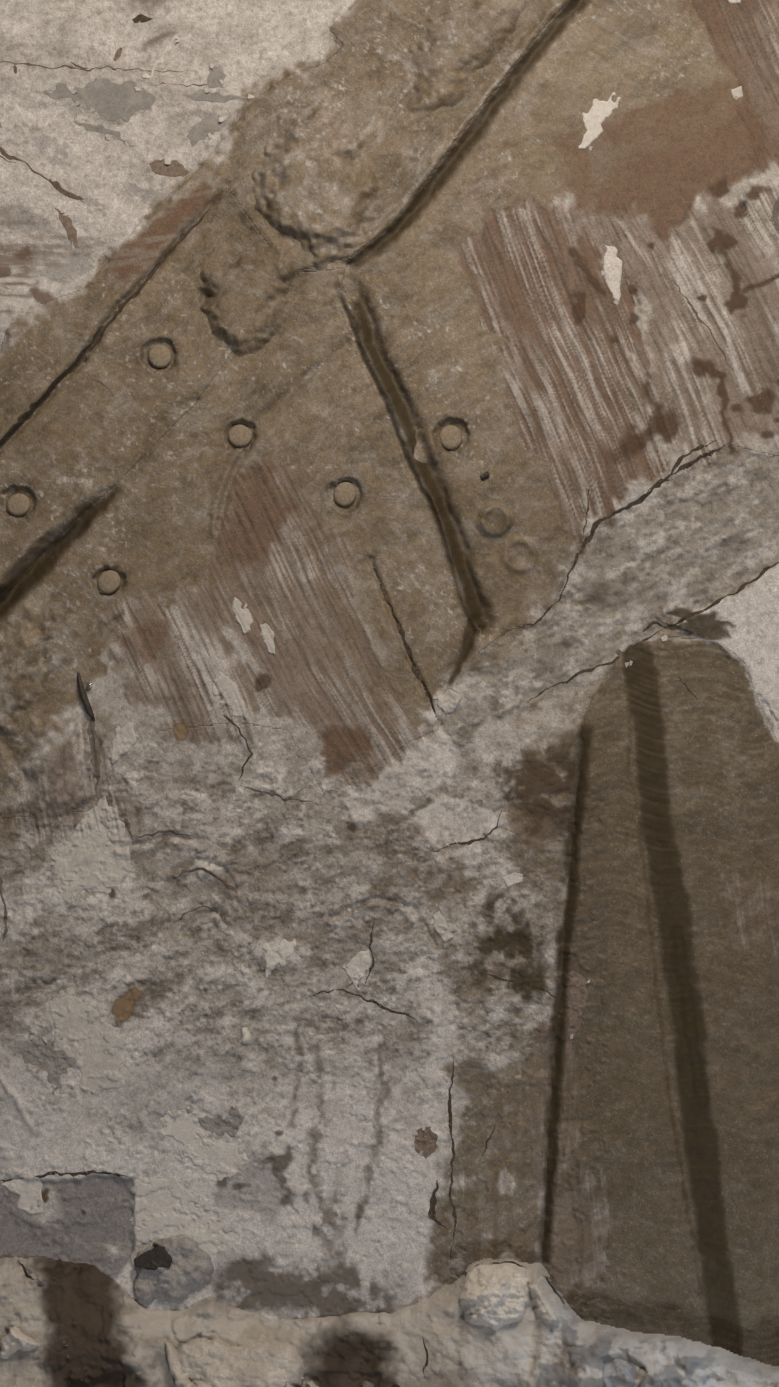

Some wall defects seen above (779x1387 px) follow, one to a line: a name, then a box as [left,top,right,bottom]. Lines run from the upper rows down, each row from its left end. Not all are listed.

crack [0,147,85,203]
peeling [43,35,181,147]
peeling [578,92,621,150]
peeling [601,245,622,305]
crack [485,440,729,651]
peeling [232,597,275,654]
rust [255,674,271,691]
crack [524,562,779,705]
rust [112,987,142,1023]
damp [473,726,591,1263]
damp [624,645,741,1356]
crack [428,1048,496,1258]